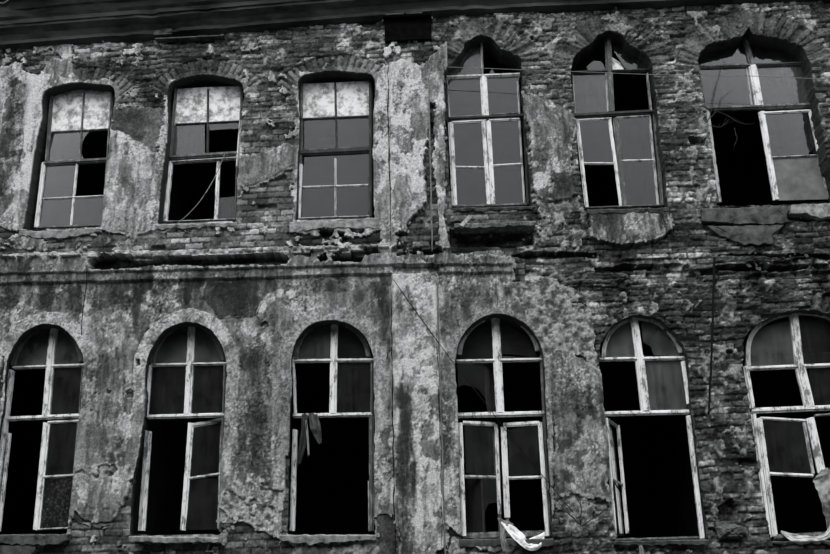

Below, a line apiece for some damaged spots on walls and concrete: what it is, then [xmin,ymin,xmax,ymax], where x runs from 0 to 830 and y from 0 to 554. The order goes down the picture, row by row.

flaking render [0,168,383,270]
flaking render [393,102,443,256]
flaking render [71,1,830,213]
spalling [437,82,830,554]
flaking render [35,455,306,554]
flaking render [320,513,401,554]
leakage [397,385,415,553]